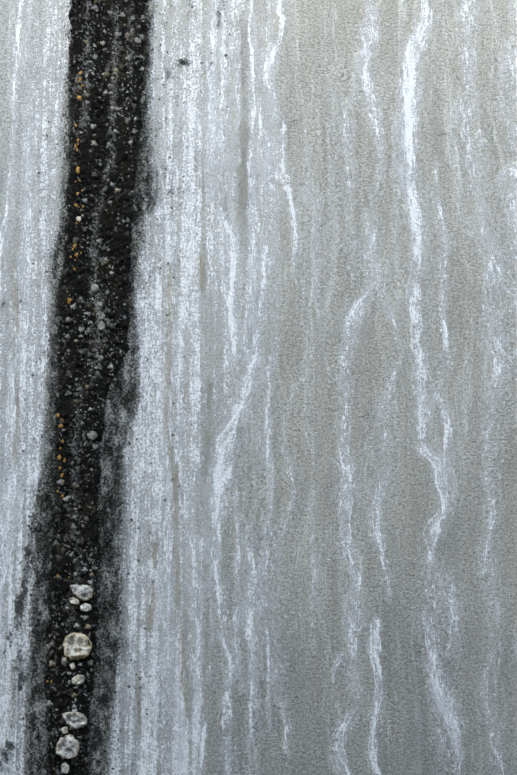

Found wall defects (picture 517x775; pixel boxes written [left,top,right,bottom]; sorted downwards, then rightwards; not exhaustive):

leakage [0,0,343,775]
leakage [307,0,465,775]
leakage [450,0,517,636]
leakage [475,645,512,775]